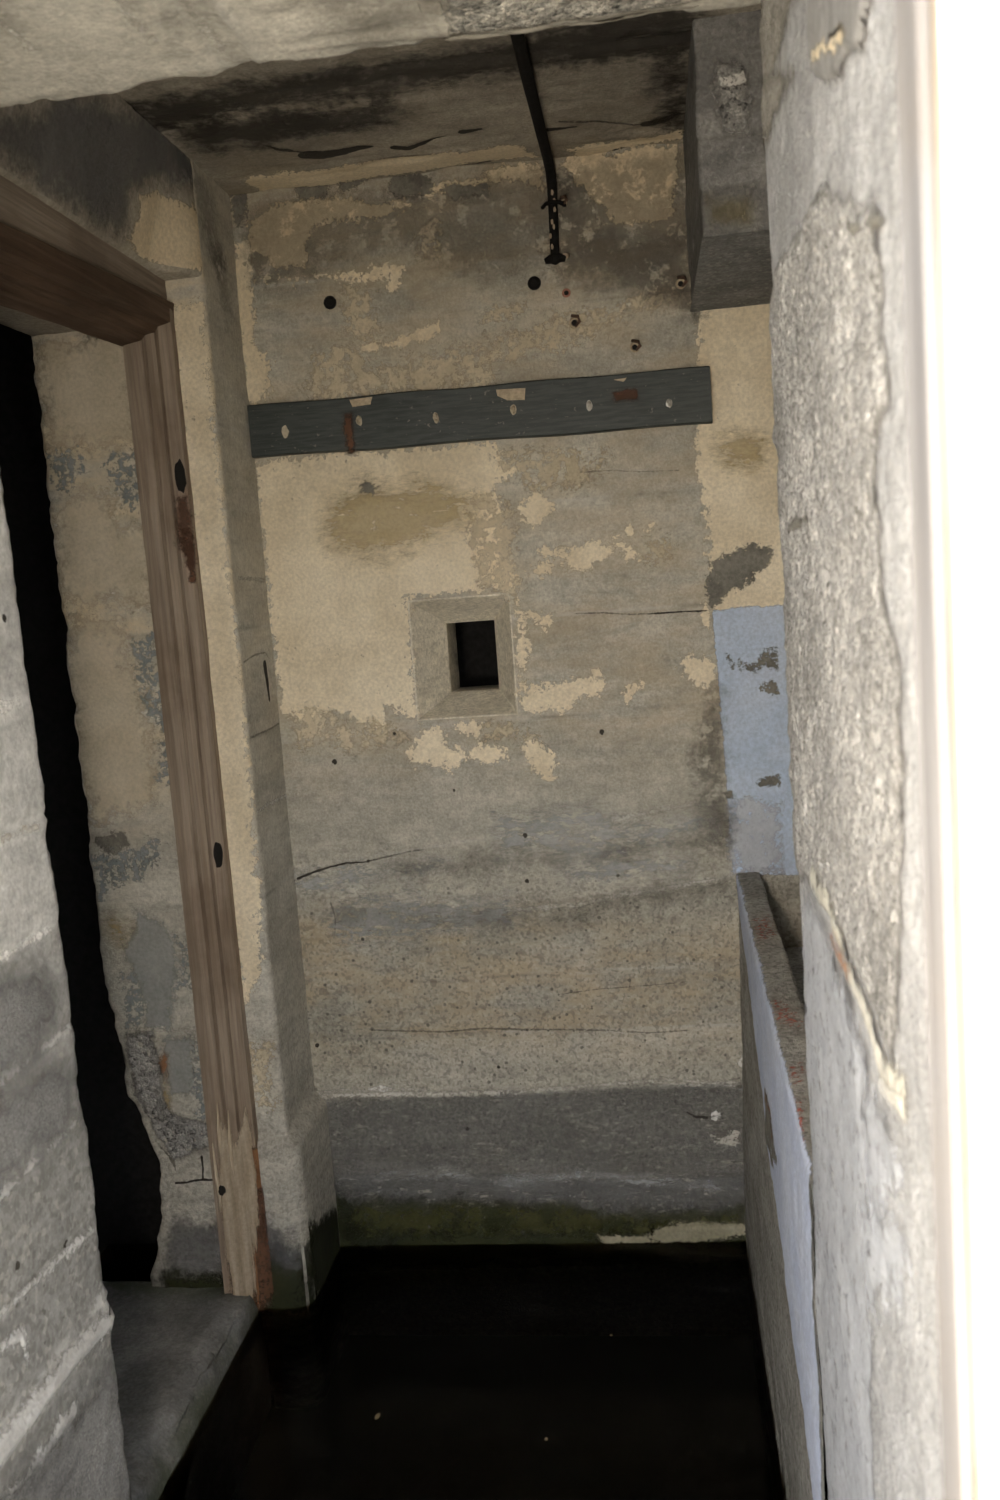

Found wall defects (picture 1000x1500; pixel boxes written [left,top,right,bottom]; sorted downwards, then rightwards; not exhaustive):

damp [0,10,705,228]
peeling [230,129,684,407]
rust [176,496,196,583]
peeling [255,440,672,792]
crack [294,850,419,924]